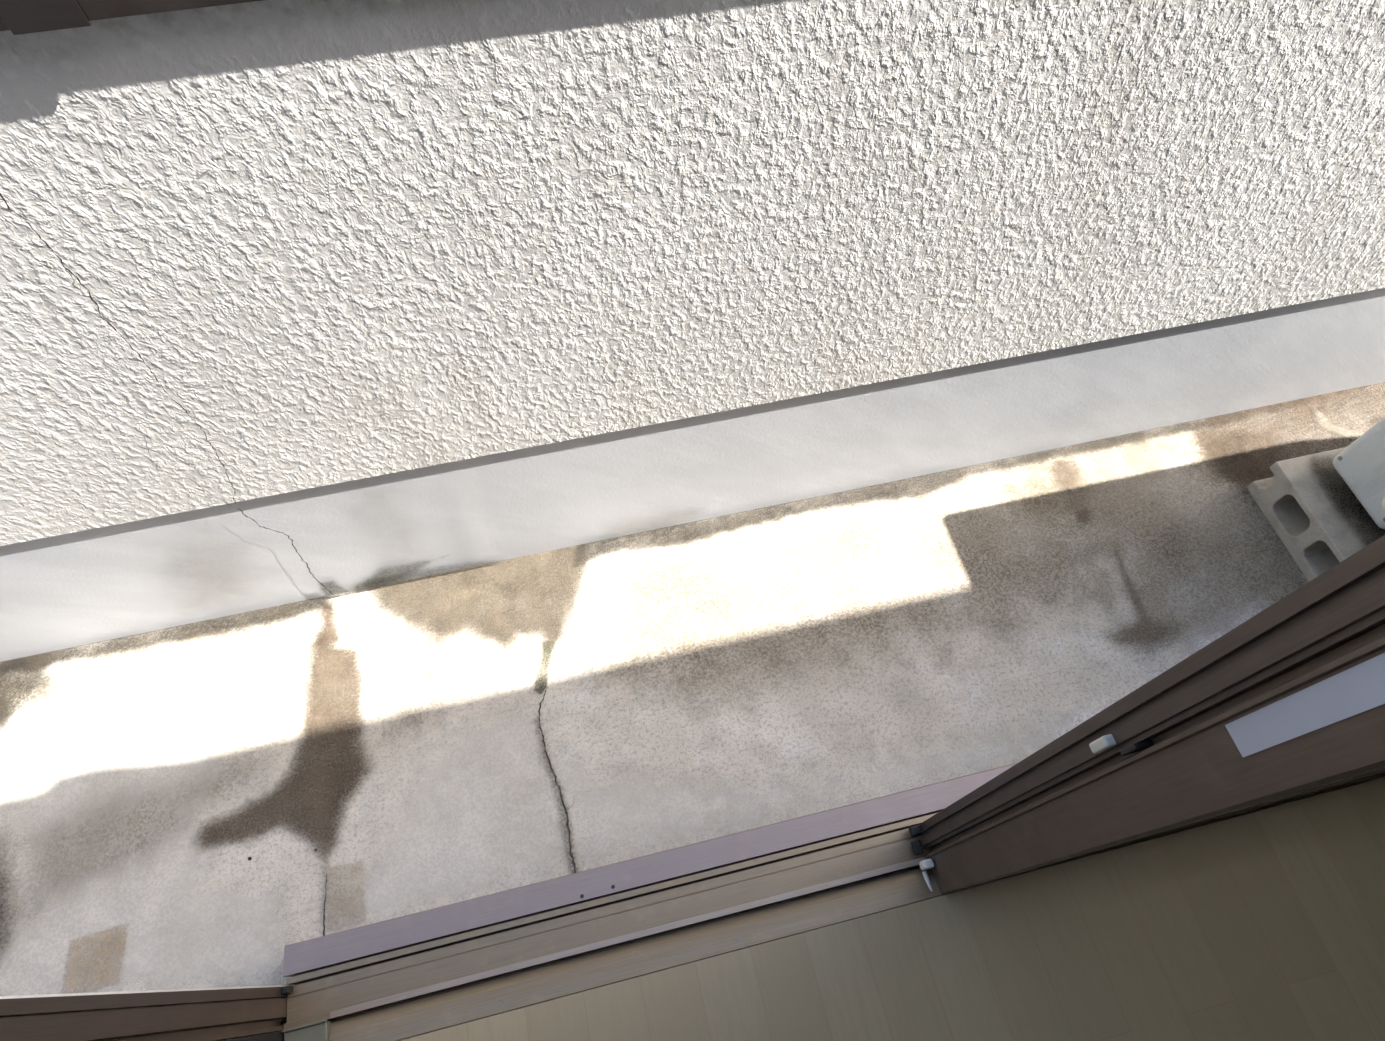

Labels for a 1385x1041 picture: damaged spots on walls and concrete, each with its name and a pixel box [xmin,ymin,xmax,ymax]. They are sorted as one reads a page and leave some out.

crack [0,193,337,597]
leakage [365,382,1385,693]
leakage [0,594,365,996]
crack [536,690,578,874]